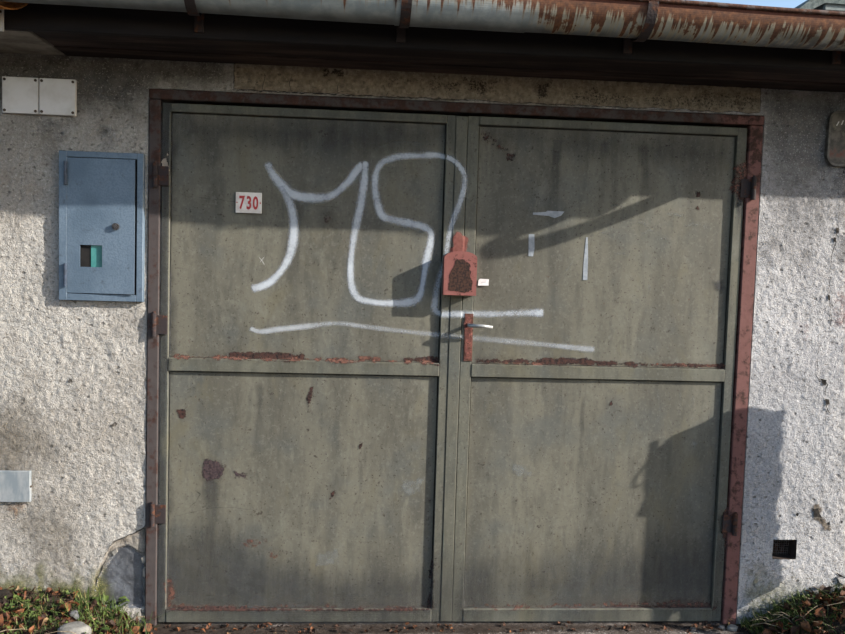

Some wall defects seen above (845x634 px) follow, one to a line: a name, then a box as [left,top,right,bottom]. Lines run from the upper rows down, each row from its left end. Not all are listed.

water stain [765,92,836,187]
rust [448,259,472,293]
crack [816,186,845,487]
rust [174,351,439,366]
rust [476,357,726,369]
rust [202,459,224,481]
spalling [813,504,831,531]
spalling [94,525,146,608]